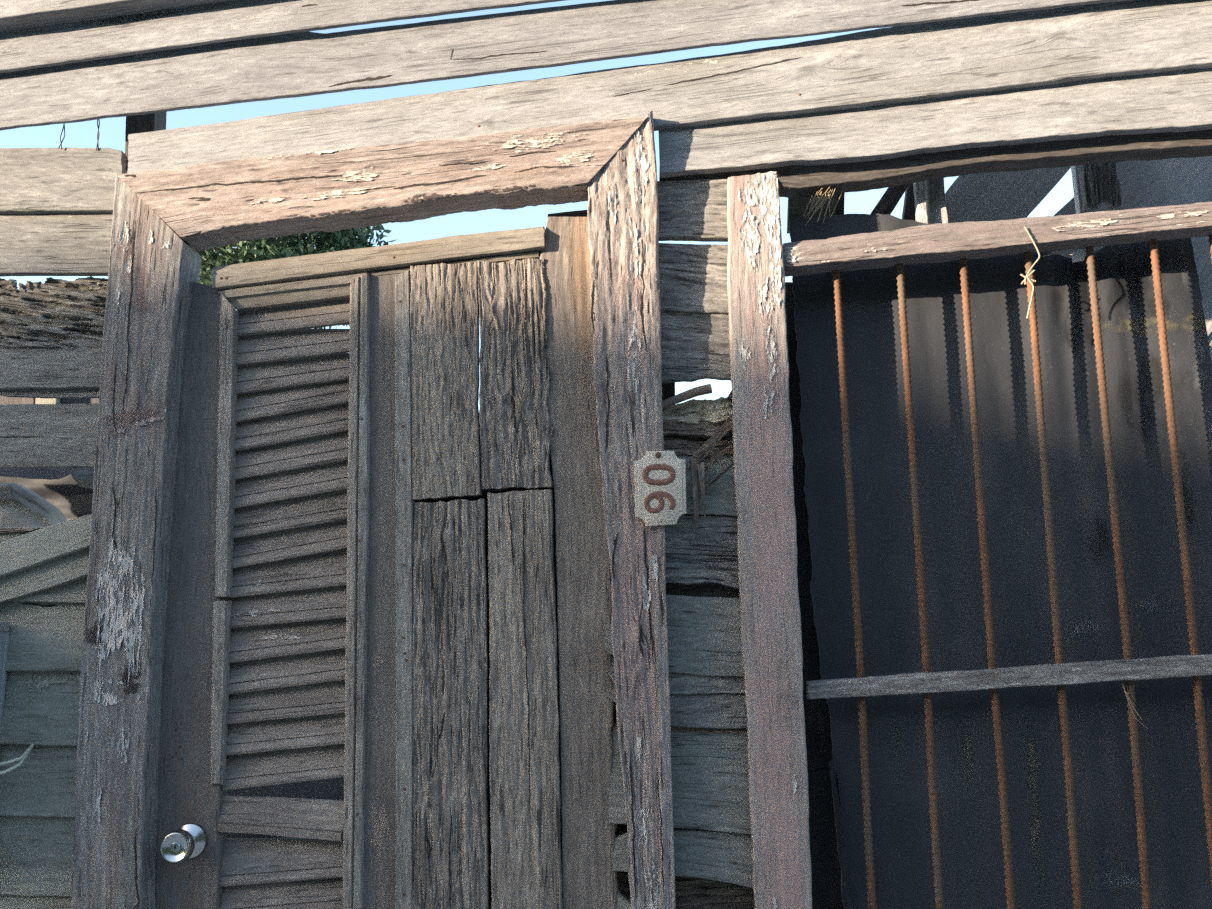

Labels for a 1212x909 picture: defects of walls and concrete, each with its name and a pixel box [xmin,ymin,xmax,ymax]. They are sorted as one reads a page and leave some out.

peeling [472,130,600,171]
peeling [736,171,796,418]
peeling [26,536,145,706]
crack [436,712,445,748]
crack [508,497,531,817]
crack [426,823,452,909]